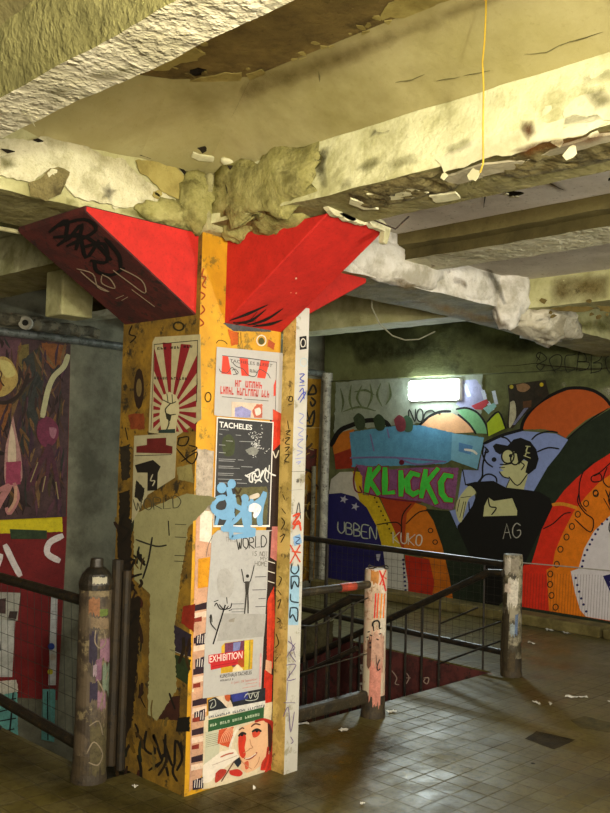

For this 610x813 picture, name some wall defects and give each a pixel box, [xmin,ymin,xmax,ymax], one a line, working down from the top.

peeling [349,0,449,35]
peeling [152,41,265,82]
crack [533,32,602,54]
peeling [0,136,184,210]
spalling [191,146,214,162]
peeling [323,91,610,245]